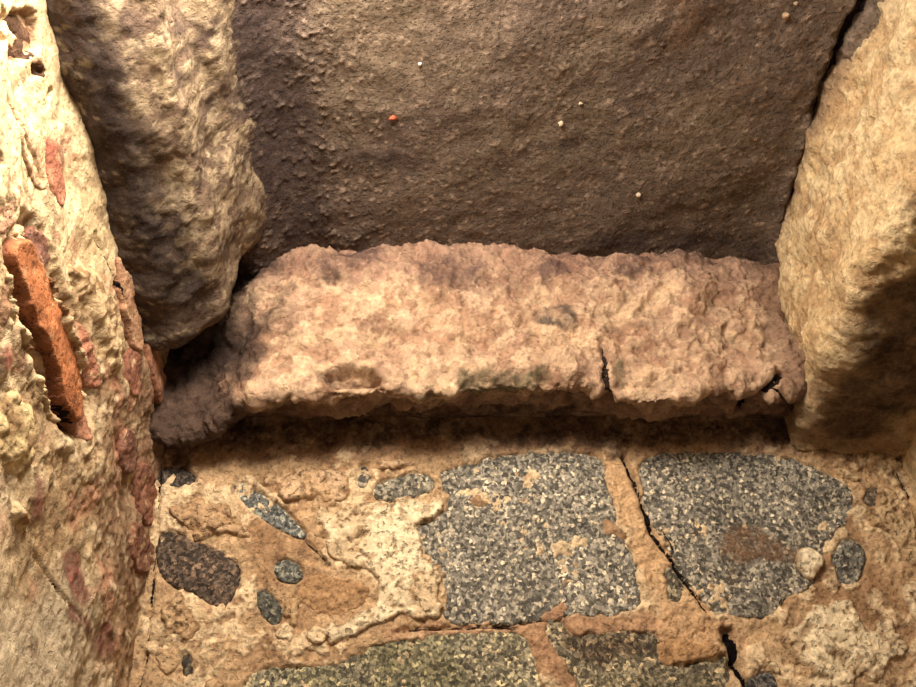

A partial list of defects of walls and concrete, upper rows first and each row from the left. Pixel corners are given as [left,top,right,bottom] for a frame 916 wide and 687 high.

spalling [3,15,45,77]
crack [824,0,866,77]
crack [601,349,612,392]
crack [621,459,707,613]
crack [722,634,745,687]